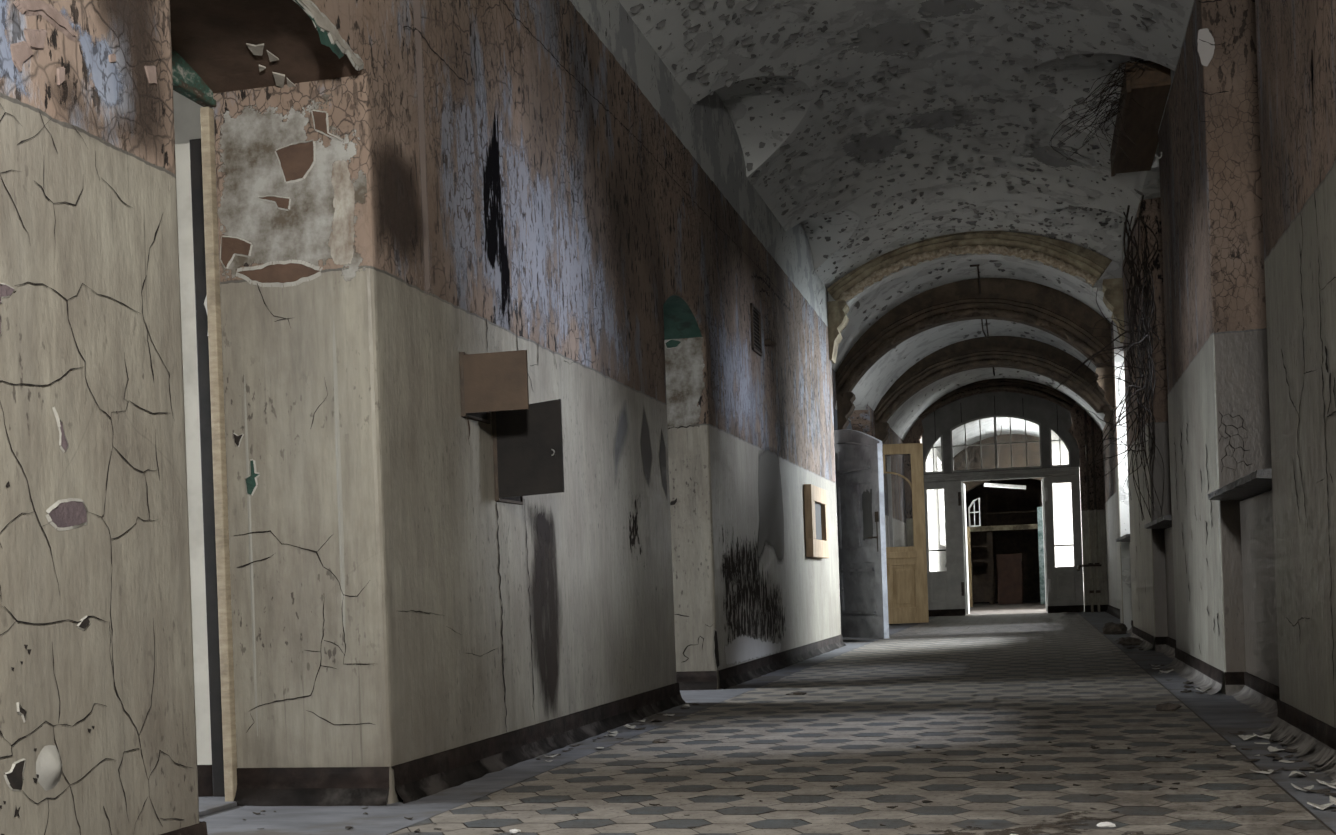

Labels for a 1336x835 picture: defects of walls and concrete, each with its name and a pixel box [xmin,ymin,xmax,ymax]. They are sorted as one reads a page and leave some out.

peeling [0,0,124,107]
peeling [144,65,157,85]
peeling [246,43,296,88]
spalling [218,82,367,287]
damp [483,113,510,324]
peeling [45,498,88,531]
crack [0,104,191,835]
damp [532,506,559,710]
crack [1281,243,1324,527]